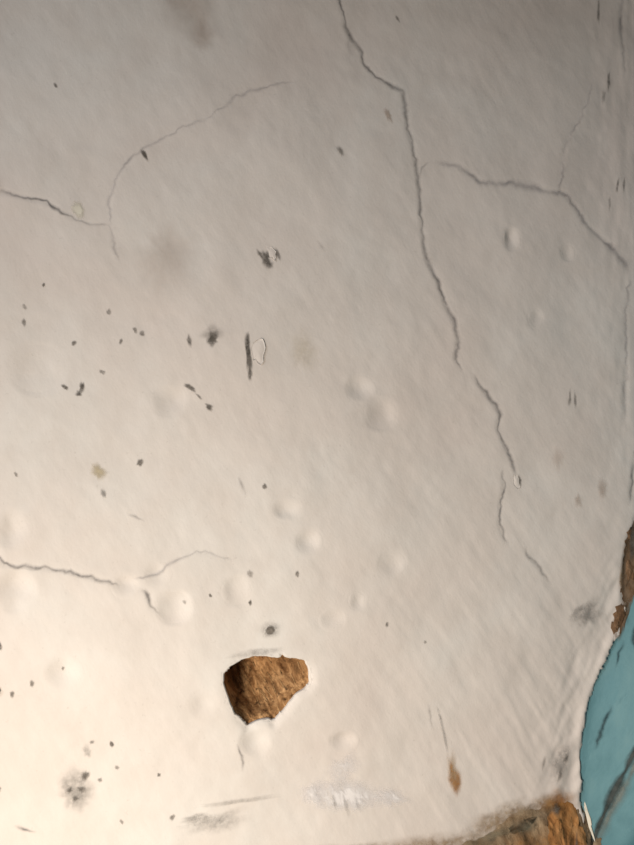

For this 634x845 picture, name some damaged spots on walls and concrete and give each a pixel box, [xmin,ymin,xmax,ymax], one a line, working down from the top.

spalling [611,522,634,641]
spalling [221,652,312,728]
spalling [538,795,596,845]